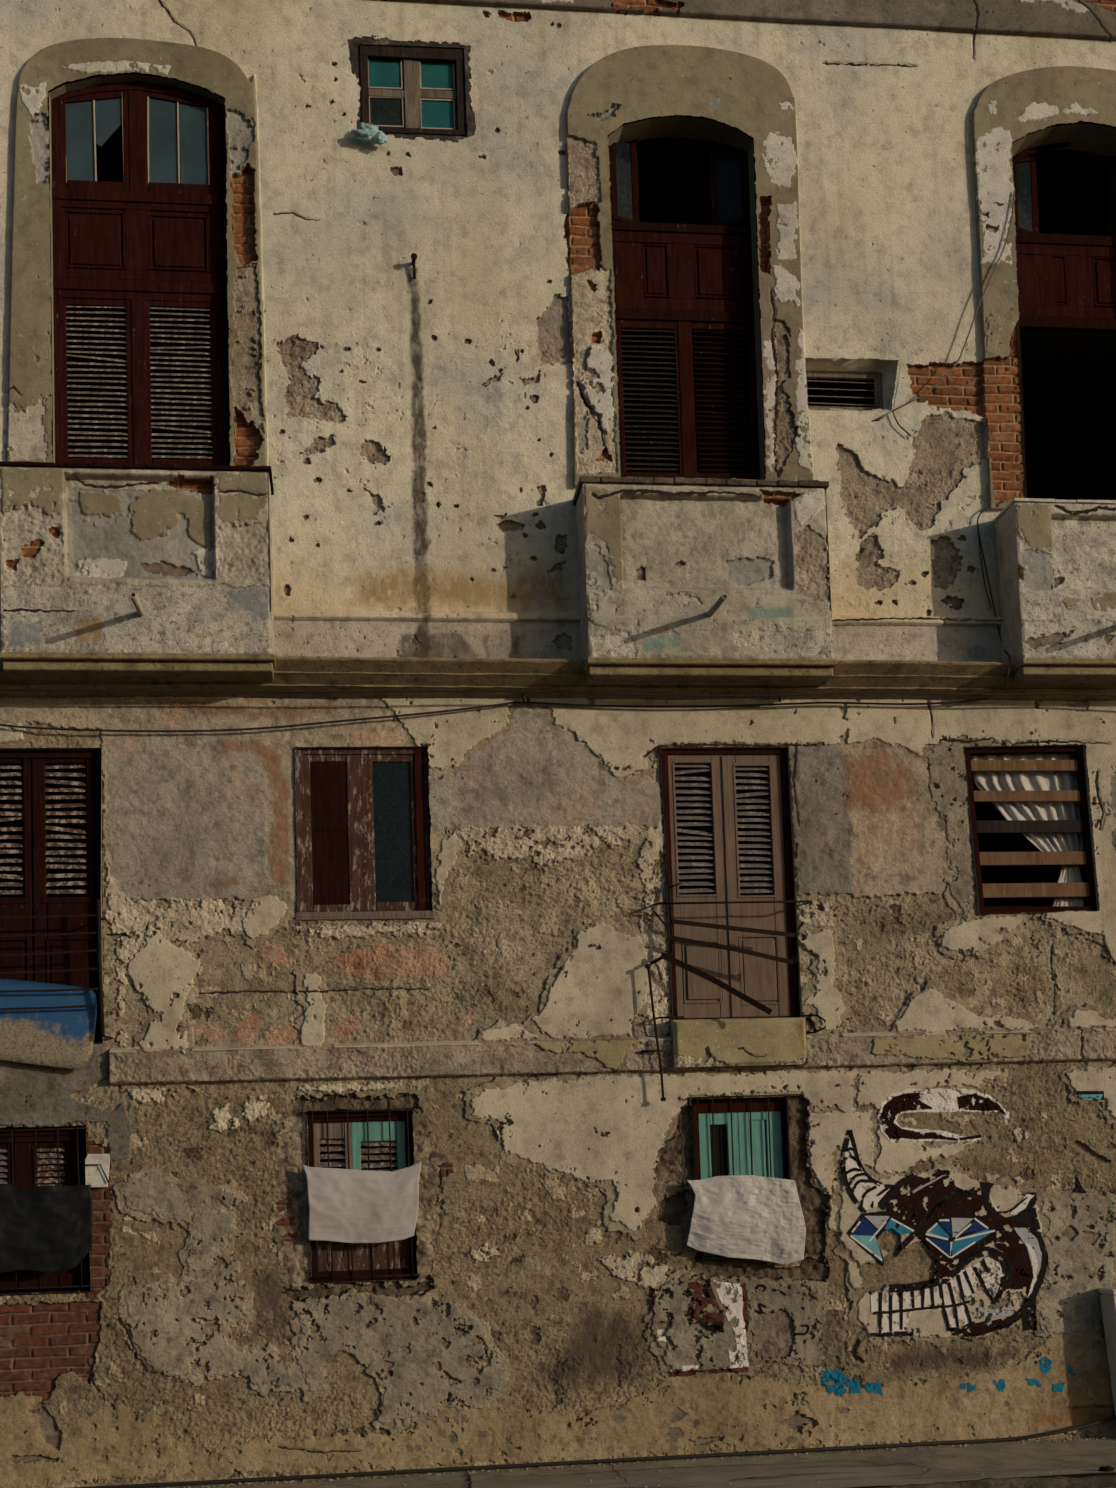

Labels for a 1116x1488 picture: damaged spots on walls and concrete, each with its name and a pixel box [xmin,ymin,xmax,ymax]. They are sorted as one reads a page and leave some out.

crack [158,0,197,46]
crack [972,0,980,59]
flaking render [1021,0,1116,13]
flaking render [589,103,621,121]
flaking render [229,163,258,266]
leakage [363,268,558,600]
spalling [482,132,1053,658]
spalling [0,333,347,653]
leakage [401,616,475,658]
spalling [1021,576,1116,658]
flaking render [377,698,1116,963]